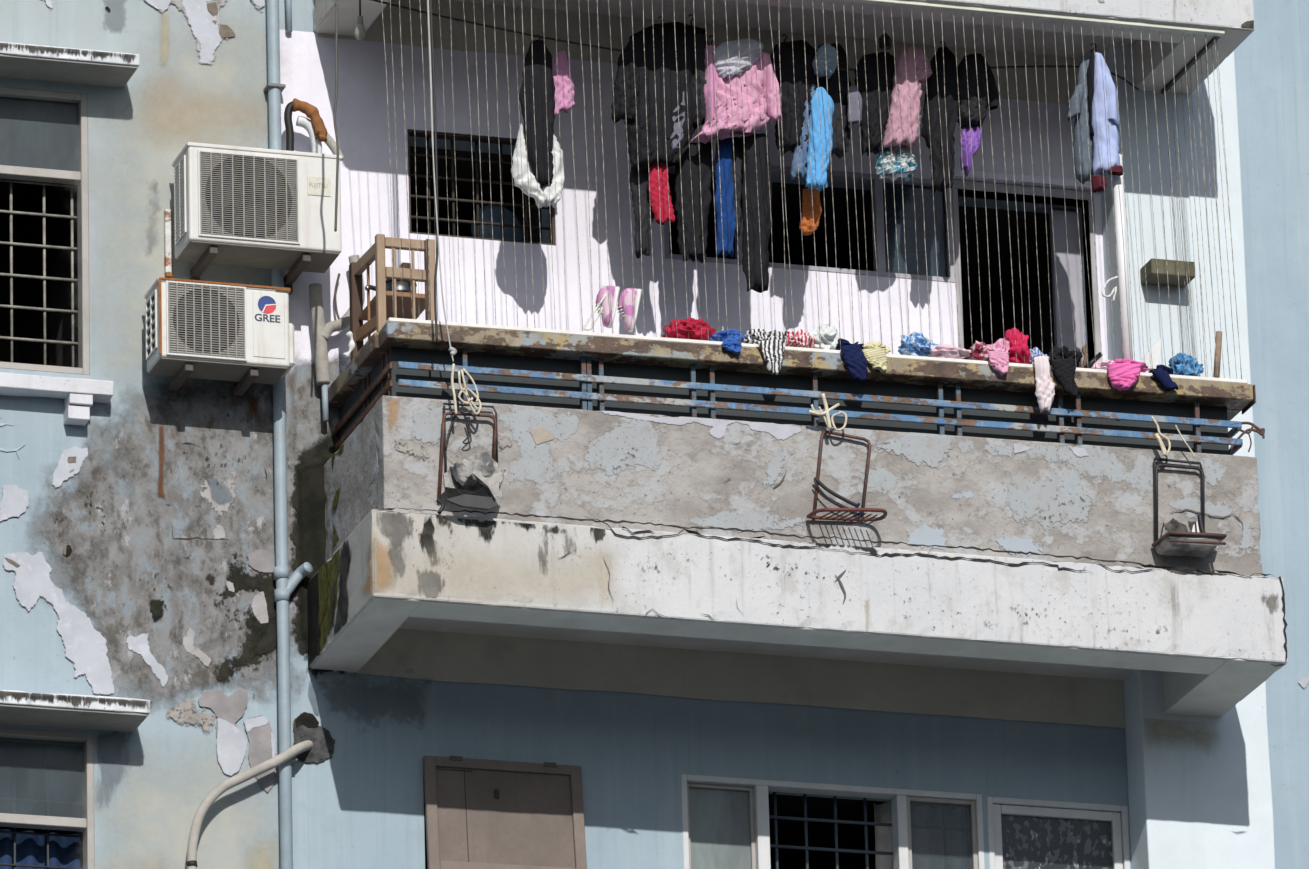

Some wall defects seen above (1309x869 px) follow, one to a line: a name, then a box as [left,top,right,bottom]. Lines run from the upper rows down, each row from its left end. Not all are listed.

damp [0,43,135,62]
peeling [145,0,236,65]
peeling [497,406,801,489]
damp [0,357,351,707]
damp [377,511,576,597]
damp [590,528,605,542]
crack [369,458,1288,667]
peeling [856,432,1259,556]
peeling [3,551,114,695]
peeling [126,633,168,691]
peeling [167,687,276,792]
spalling [293,681,335,763]